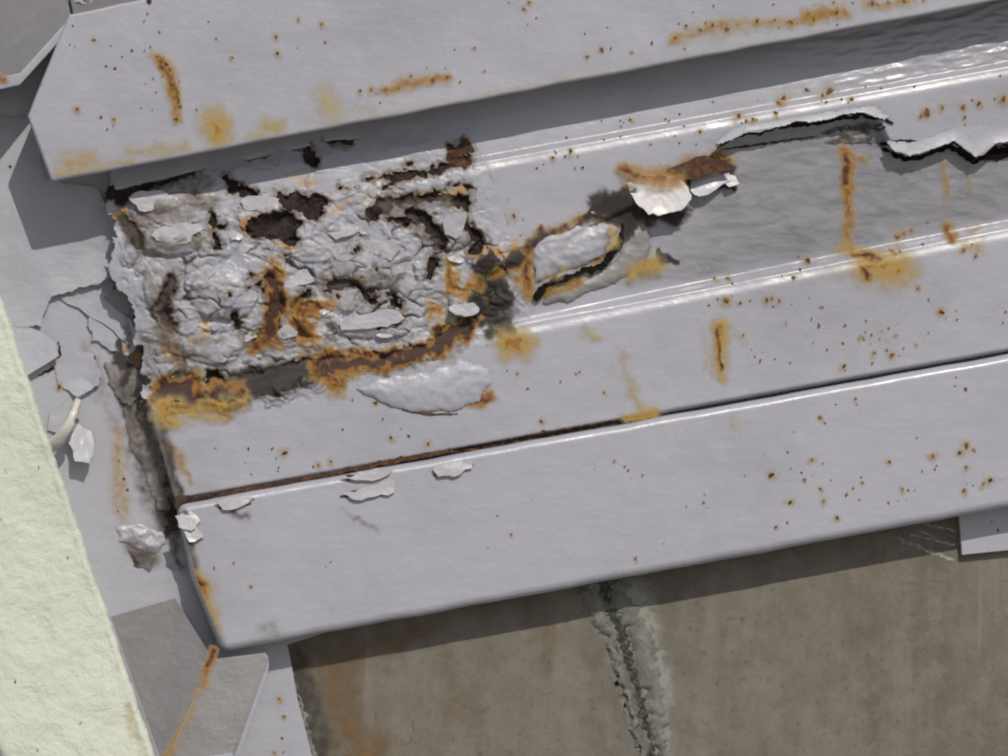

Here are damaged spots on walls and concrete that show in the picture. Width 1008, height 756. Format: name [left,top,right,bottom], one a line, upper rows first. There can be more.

corrosion [121,46,182,122]
corrosion [158,272,177,322]
peeling [0,114,534,422]
corrosion [248,265,483,401]
corrosion [445,207,618,299]
corrosion [712,320,729,381]
corrosion [838,146,920,290]
peeling [48,398,94,464]
peeling [175,511,204,542]
peeling [215,496,254,517]
peeling [340,468,395,500]
crack [578,577,676,756]